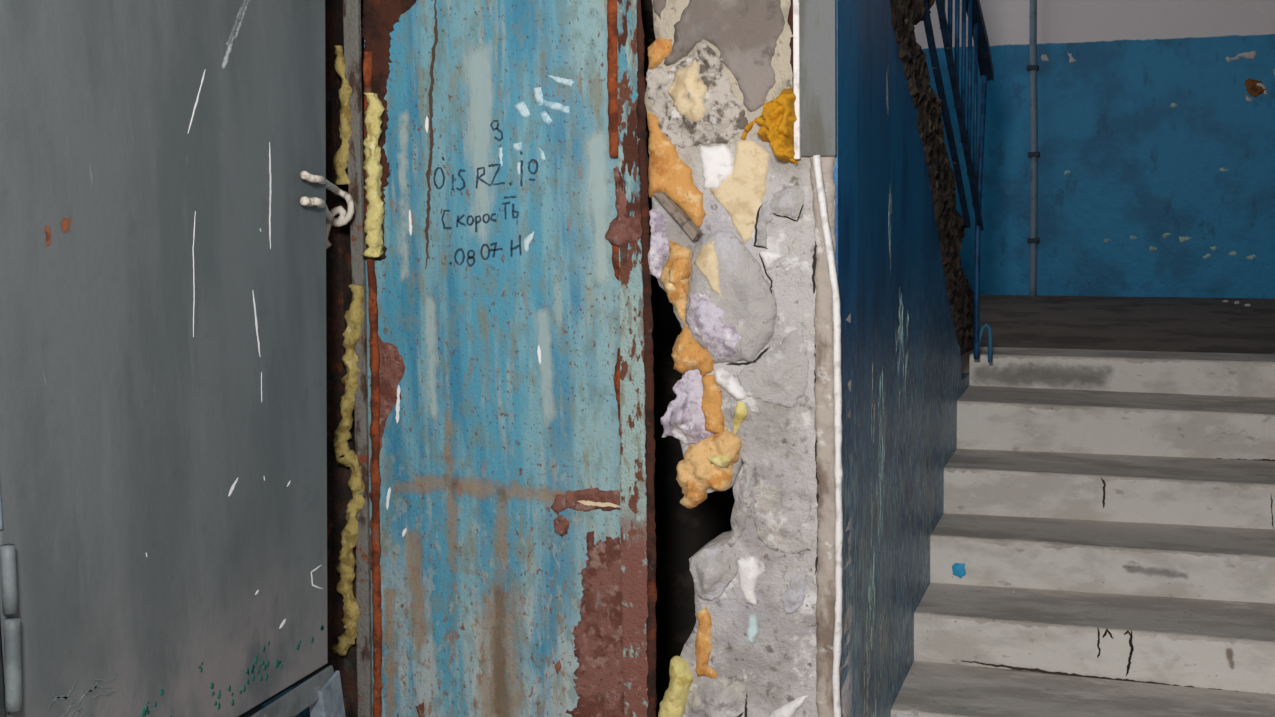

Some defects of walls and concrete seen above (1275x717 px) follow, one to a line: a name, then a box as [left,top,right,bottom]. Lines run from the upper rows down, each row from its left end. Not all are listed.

corrosion [361,0,416,261]
flaking render [653,0,794,112]
spalling [887,0,974,355]
peeling [1226,51,1256,62]
flaking render [1244,69,1275,102]
corrosion [369,327,405,474]
corrosion [605,0,657,717]
corrosion [550,488,620,537]
corrosion [554,531,624,717]
crack [737,694,748,717]
flaking render [769,696,807,717]
crack [961,627,1238,692]